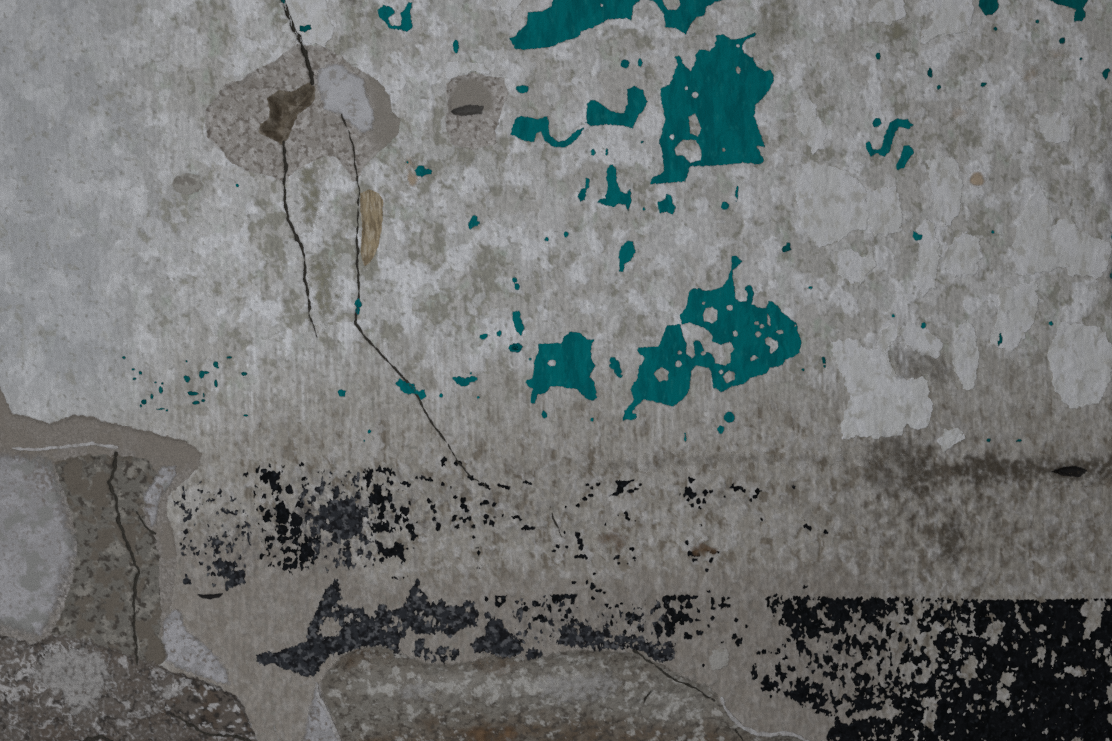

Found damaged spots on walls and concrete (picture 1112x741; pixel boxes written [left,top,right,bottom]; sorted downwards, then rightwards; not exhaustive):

crack [280,0,314,85]
spalling [205,0,401,266]
peeling [377,2,413,32]
peeling [444,33,774,214]
peeling [499,0,722,50]
crack [282,140,318,338]
crack [341,114,487,488]
peeling [479,311,597,418]
peeling [609,256,802,421]
crack [107,451,156,665]
spalling [0,388,803,741]
peeling [750,585,1112,741]